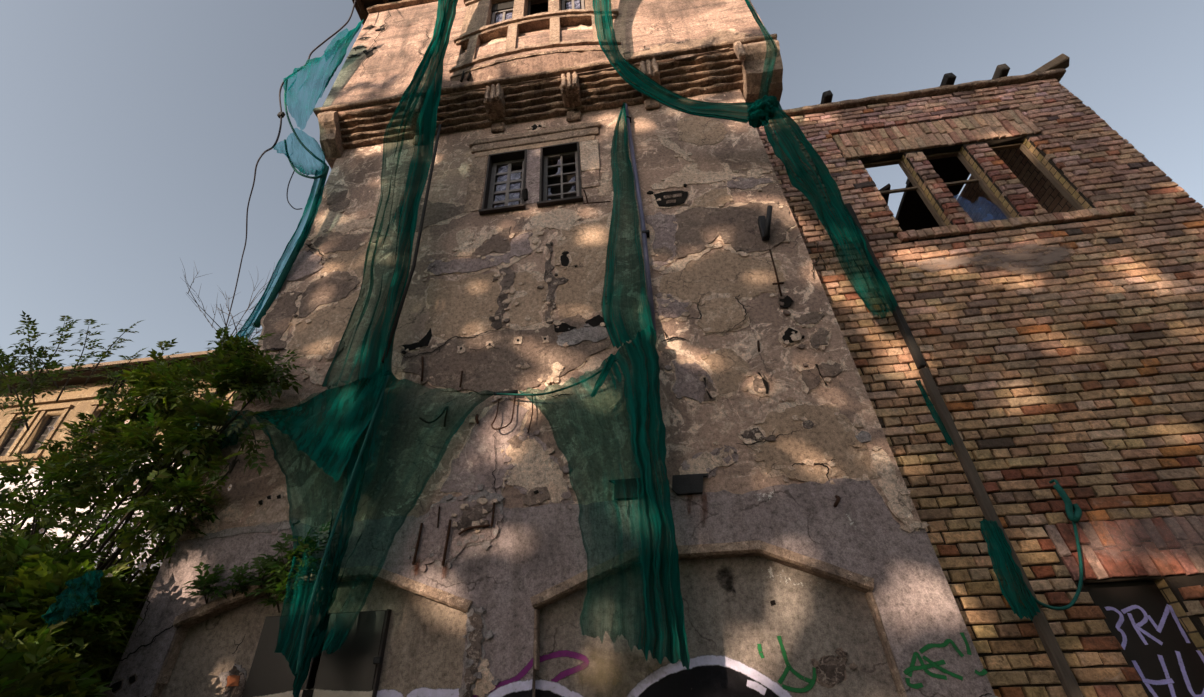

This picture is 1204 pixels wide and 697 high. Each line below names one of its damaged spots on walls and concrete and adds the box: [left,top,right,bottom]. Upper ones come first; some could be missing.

flaking render [325,188,351,213]
flaking render [415,198,473,232]
flaking render [645,170,797,271]
flaking render [258,205,399,384]
flaking render [400,217,612,572]
flaking render [664,350,719,405]
spalling [741,293,845,430]
flaking render [459,657,500,697]